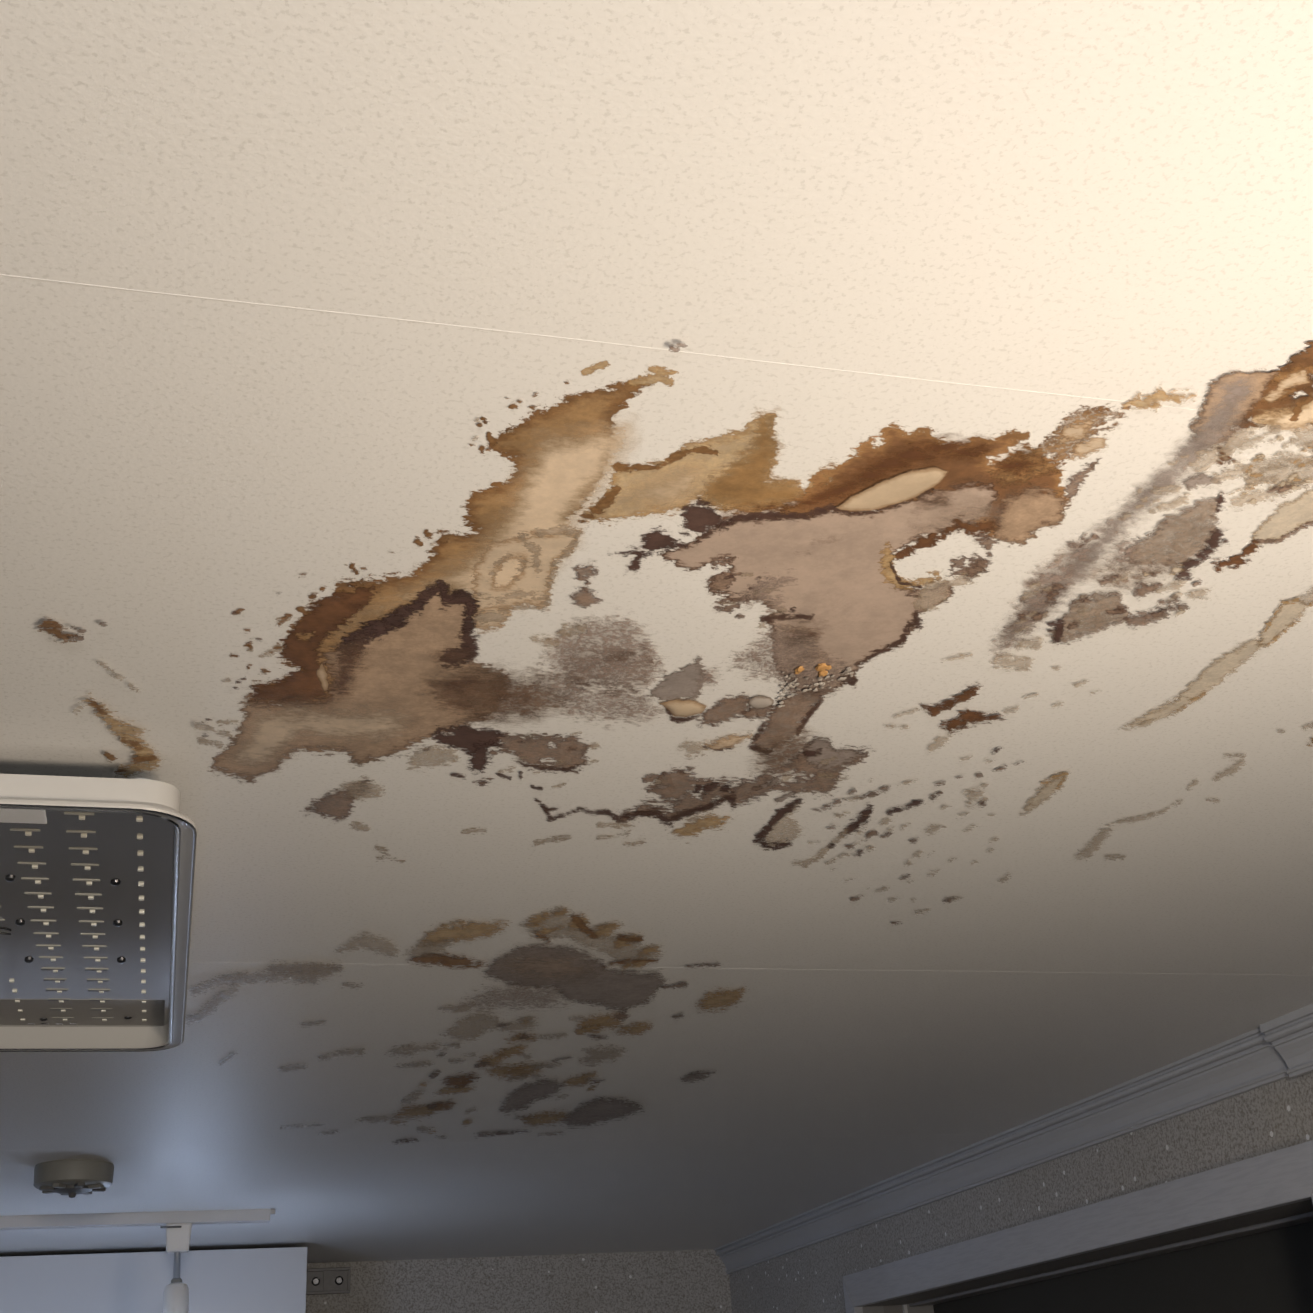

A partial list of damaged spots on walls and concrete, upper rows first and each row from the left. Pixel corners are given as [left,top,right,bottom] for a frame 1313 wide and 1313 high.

water stain [195,341,1313,914]
spalling [777,654,855,708]
water stain [73,698,163,778]
water stain [185,906,721,1145]
water stain [673,986,747,1019]